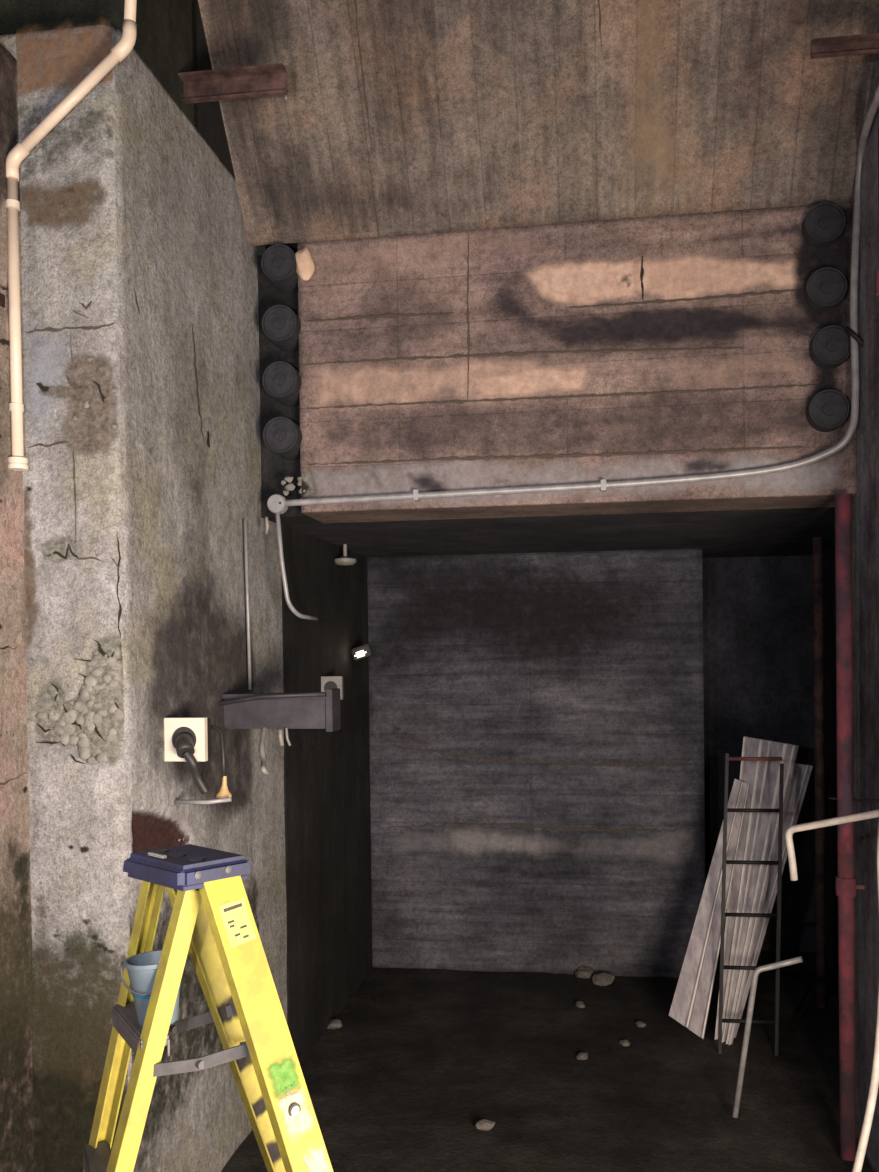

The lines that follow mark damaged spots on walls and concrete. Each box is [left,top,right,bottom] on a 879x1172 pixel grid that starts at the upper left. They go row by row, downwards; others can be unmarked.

water stain [499,207,852,345]
spalling [36,355,119,452]
water stain [810,355,839,400]
spalling [35,637,125,765]
water stain [0,848,33,1053]